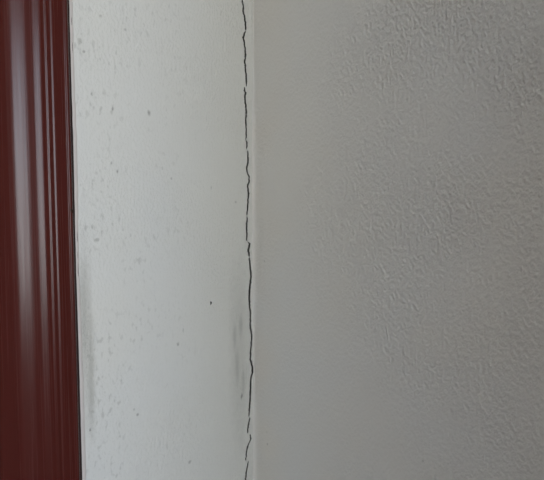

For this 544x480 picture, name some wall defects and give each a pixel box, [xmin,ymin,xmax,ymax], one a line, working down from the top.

crack [241,0,254,480]